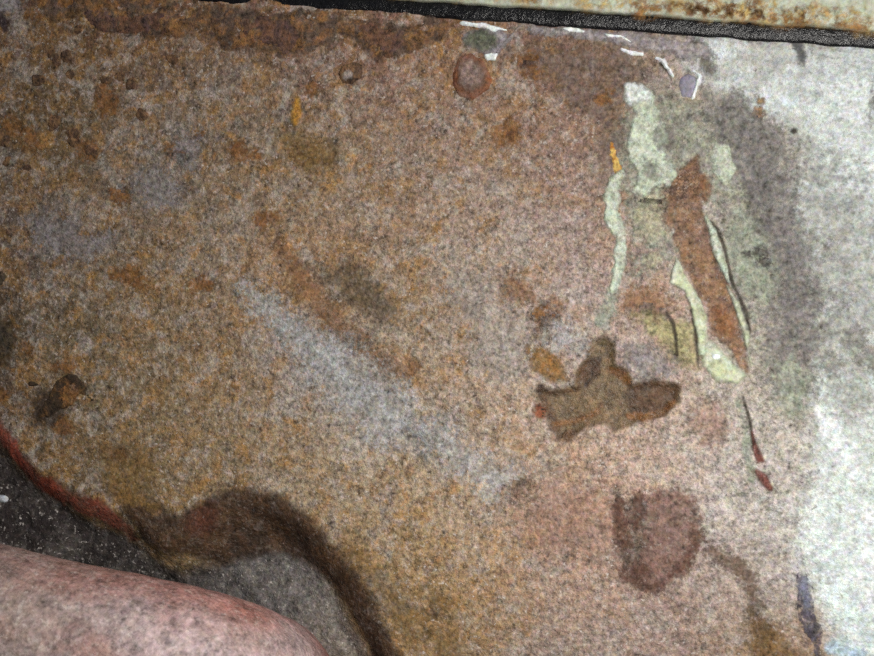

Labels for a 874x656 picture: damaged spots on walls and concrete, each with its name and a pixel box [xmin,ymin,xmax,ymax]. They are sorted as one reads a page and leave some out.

corrosion [24,0,459,62]
corrosion [577,0,872,31]
corrosion [47,47,75,80]
corrosion [93,71,136,118]
corrosion [48,115,102,161]
corrosion [490,117,522,147]
peeling [460,21,787,442]
corrosion [0,316,33,365]
water stain [439,267,588,382]
water stain [618,342,679,382]
corrosion [28,360,93,437]
water stain [107,484,400,656]